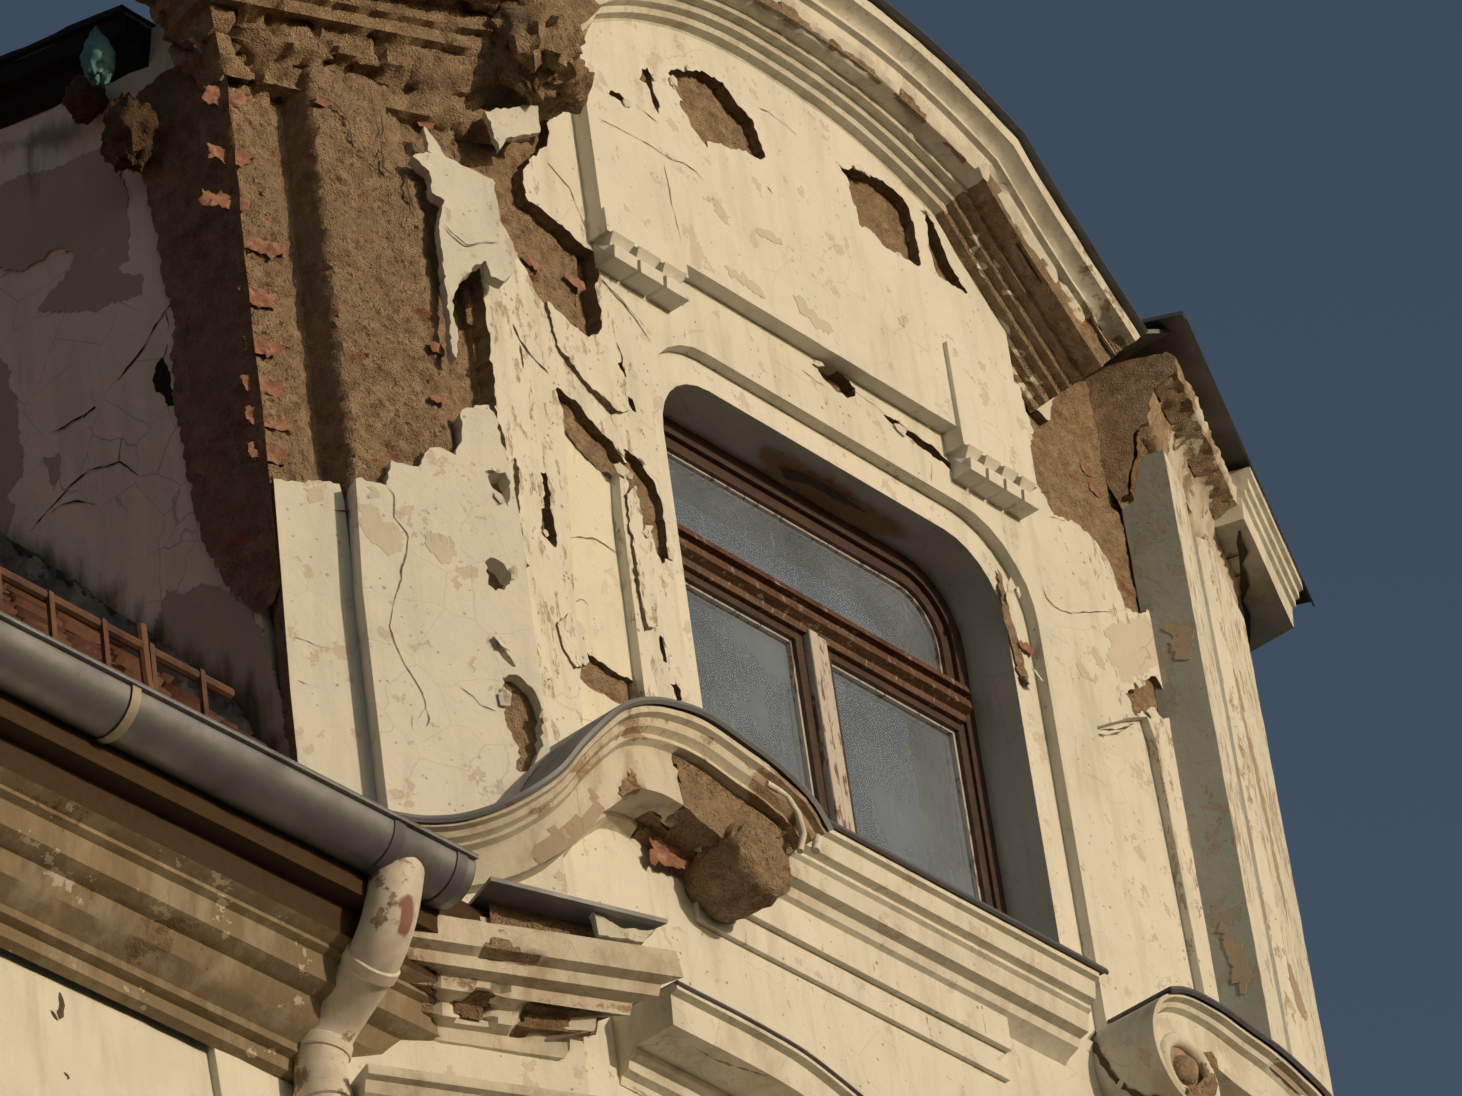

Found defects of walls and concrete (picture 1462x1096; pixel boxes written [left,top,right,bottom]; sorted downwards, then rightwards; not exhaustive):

spalling [640,63,753,156]
spalling [846,164,910,260]
spalling [928,241,950,283]
crack [32,436,138,529]
crack [53,305,170,432]
flaking render [0,64,630,772]
spalling [1155,376,1233,520]
crack [388,488,430,727]
spalling [997,569,1043,688]
spalling [1026,381,1195,722]
spalling [649,821,792,921]
spalling [1187,1051,1219,1096]